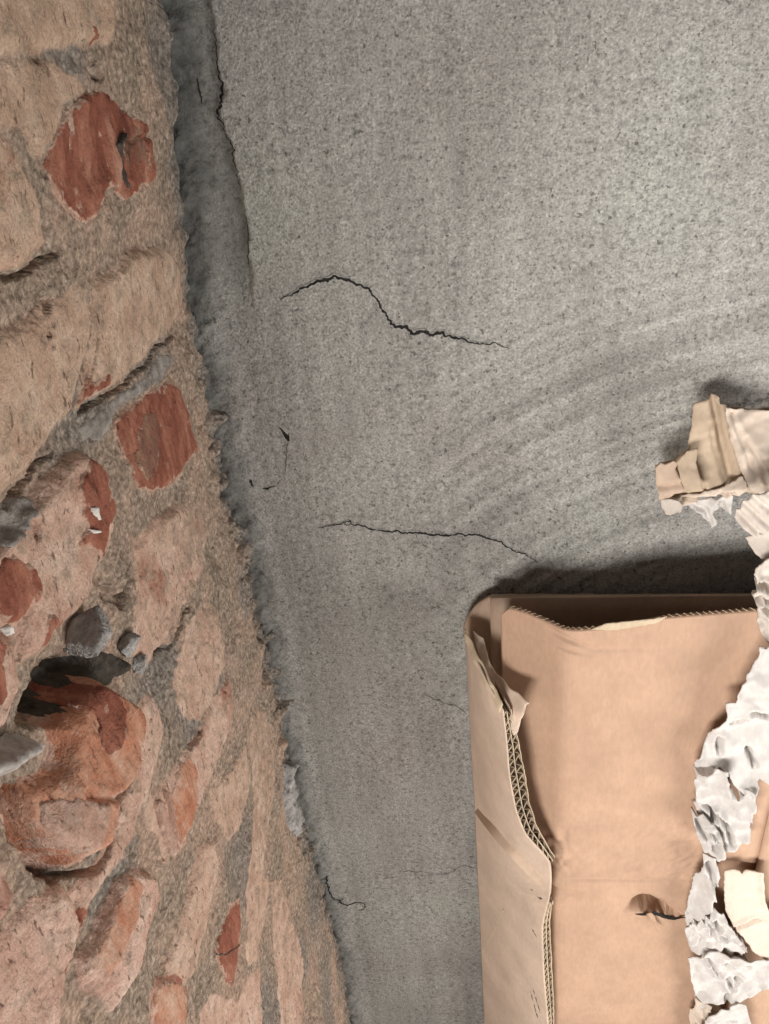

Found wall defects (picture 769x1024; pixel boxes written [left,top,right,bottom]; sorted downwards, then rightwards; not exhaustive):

crack [197,22,250,264]
crack [280,273,509,349]
crack [319,519,538,564]